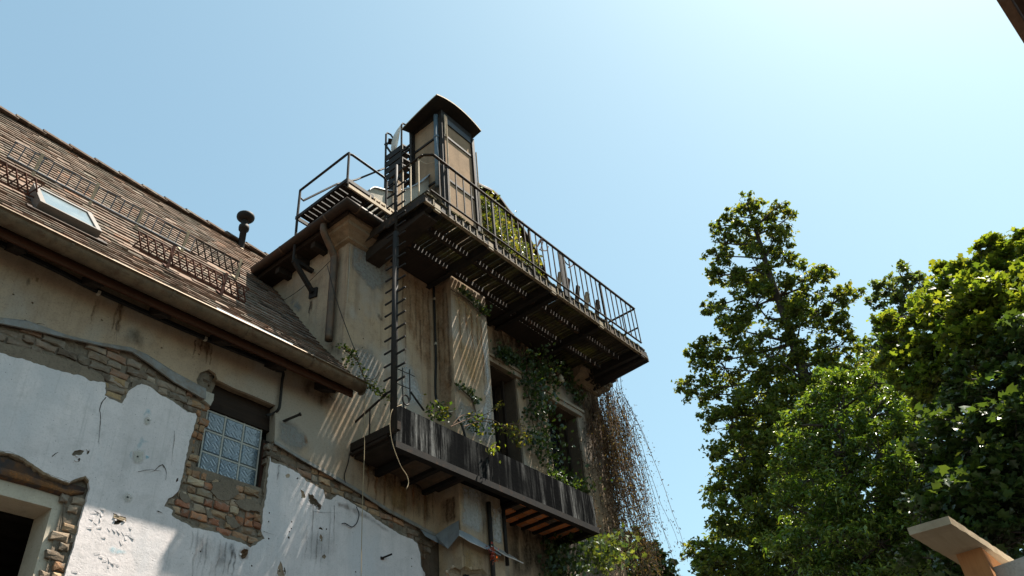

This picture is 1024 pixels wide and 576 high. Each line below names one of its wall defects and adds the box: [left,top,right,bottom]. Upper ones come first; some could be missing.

flaking render [0,325,270,576]
flaking render [261,443,437,567]